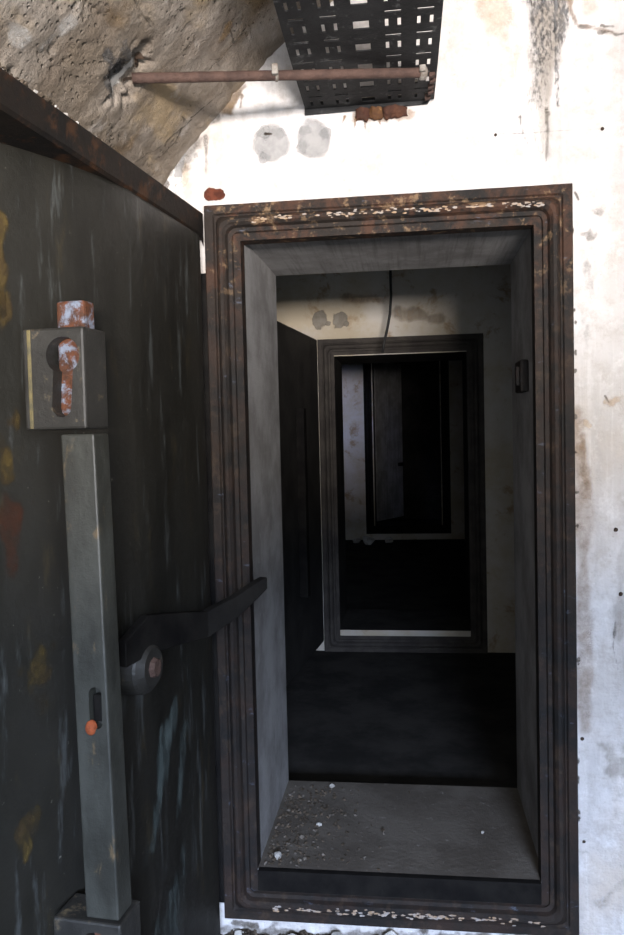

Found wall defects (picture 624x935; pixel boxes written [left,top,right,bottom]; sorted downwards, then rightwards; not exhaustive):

leakage [527,0,571,93]
corrosion [204,188,225,201]